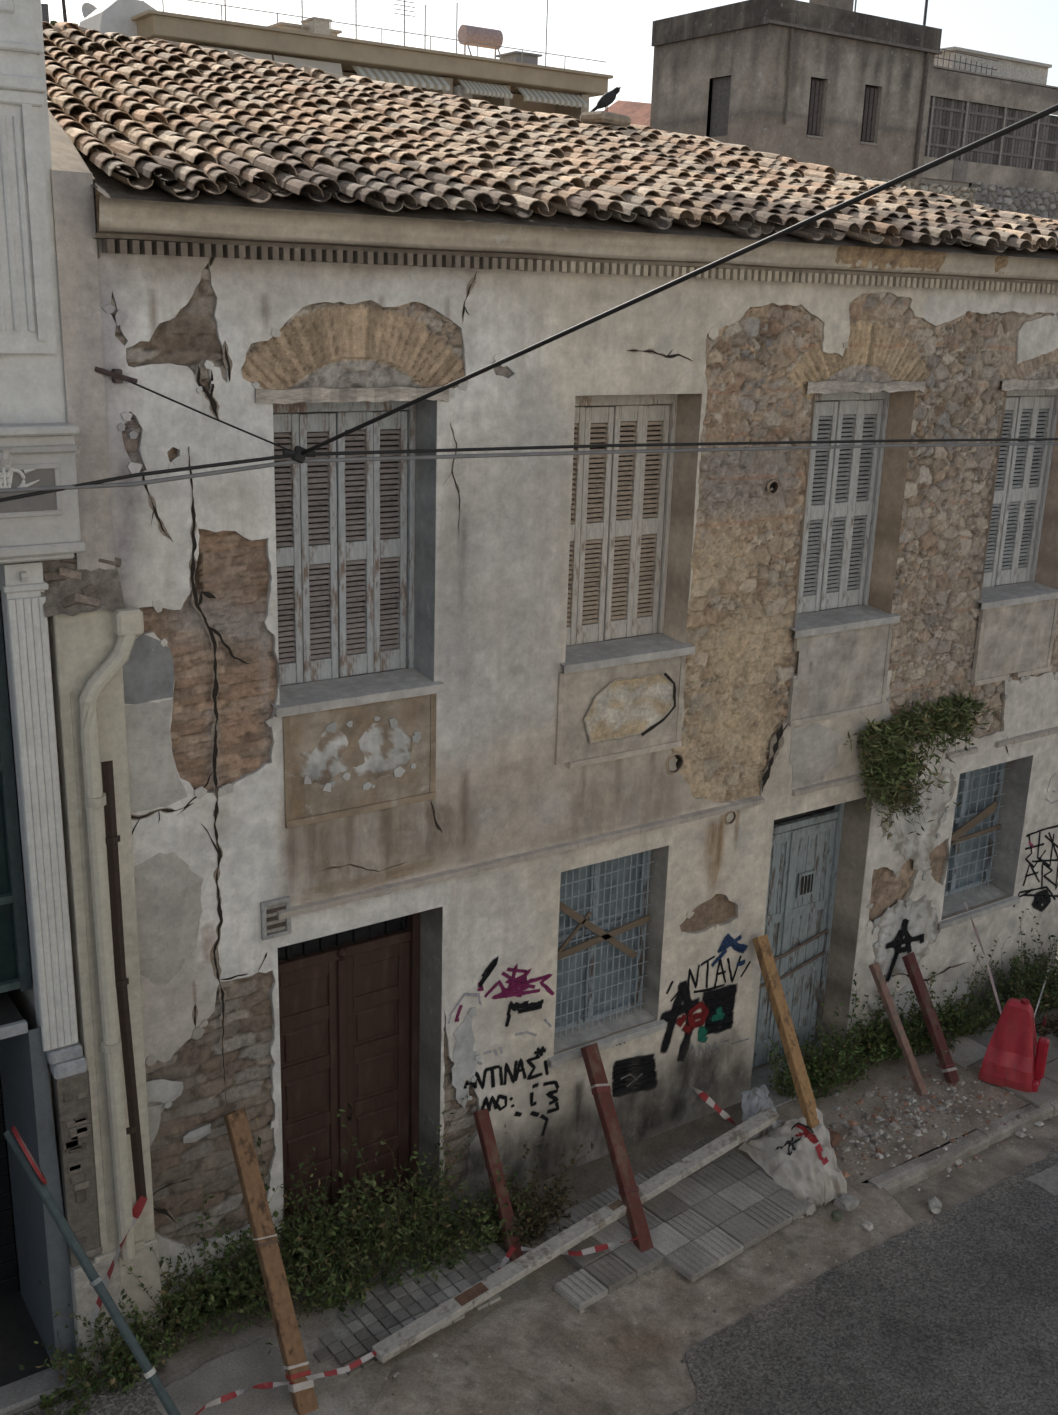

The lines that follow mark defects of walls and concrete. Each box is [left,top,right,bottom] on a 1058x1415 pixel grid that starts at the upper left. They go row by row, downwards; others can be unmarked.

crack [195,341,233,419]
spalling [102,265,468,398]
crack [131,447,267,1102]
spalling [139,529,277,799]
peeling [300,716,422,792]
spalling [680,894,735,932]
spalling [584,292,1058,825]
peeling [866,767,957,981]
spalling [145,971,279,1246]